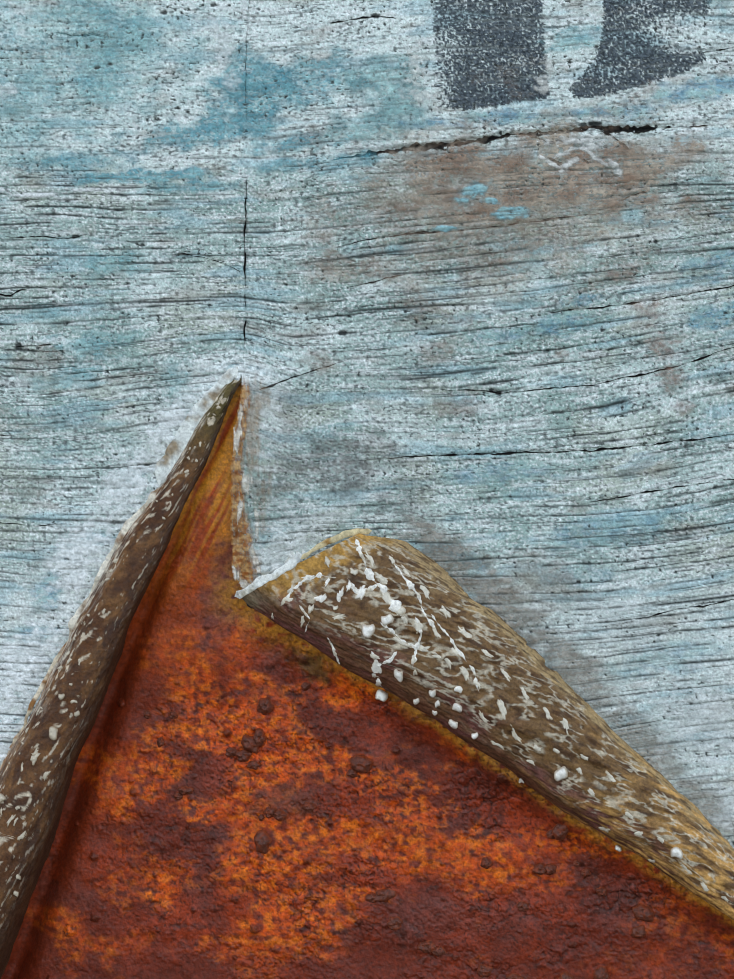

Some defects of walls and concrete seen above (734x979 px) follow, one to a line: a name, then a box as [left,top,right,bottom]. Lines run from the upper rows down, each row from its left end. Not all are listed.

crack [334,124,707,171]
corrosion [230,385,257,584]
peeling [237,474,252,524]
peeling [0,367,247,979]
peeling [232,528,734,920]